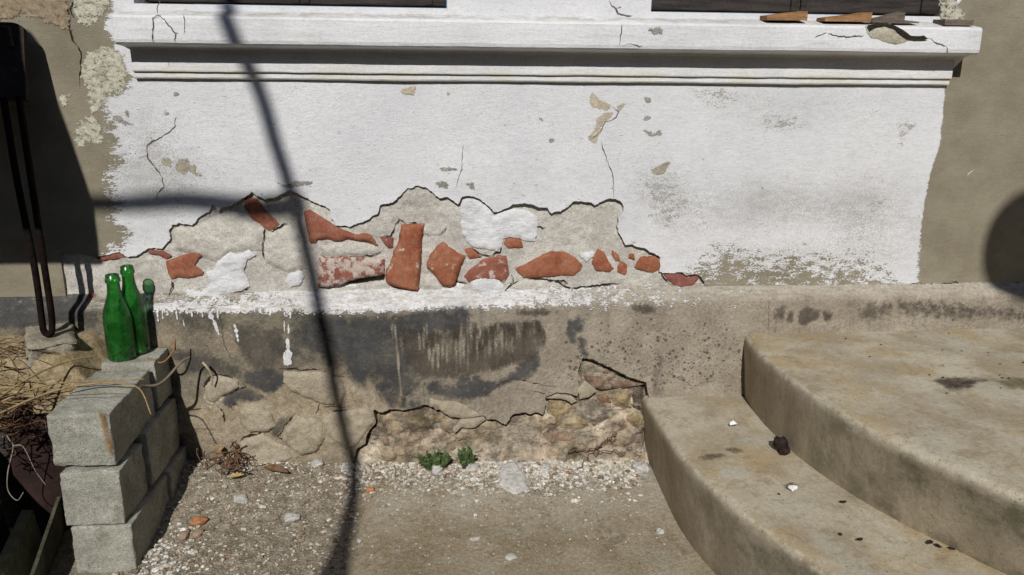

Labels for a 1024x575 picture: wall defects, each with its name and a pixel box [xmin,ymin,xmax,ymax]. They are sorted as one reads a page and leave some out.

crack [152,0,185,44]
spalling [866,23,928,44]
peeling [73,45,133,147]
crack [143,118,176,199]
peeling [588,92,625,143]
crack [594,106,619,197]
spalling [62,167,703,297]
water stain [774,306,832,325]
water stain [858,301,1024,320]
spalling [203,373,241,409]
water stain [162,306,550,408]
spalling [238,358,649,464]